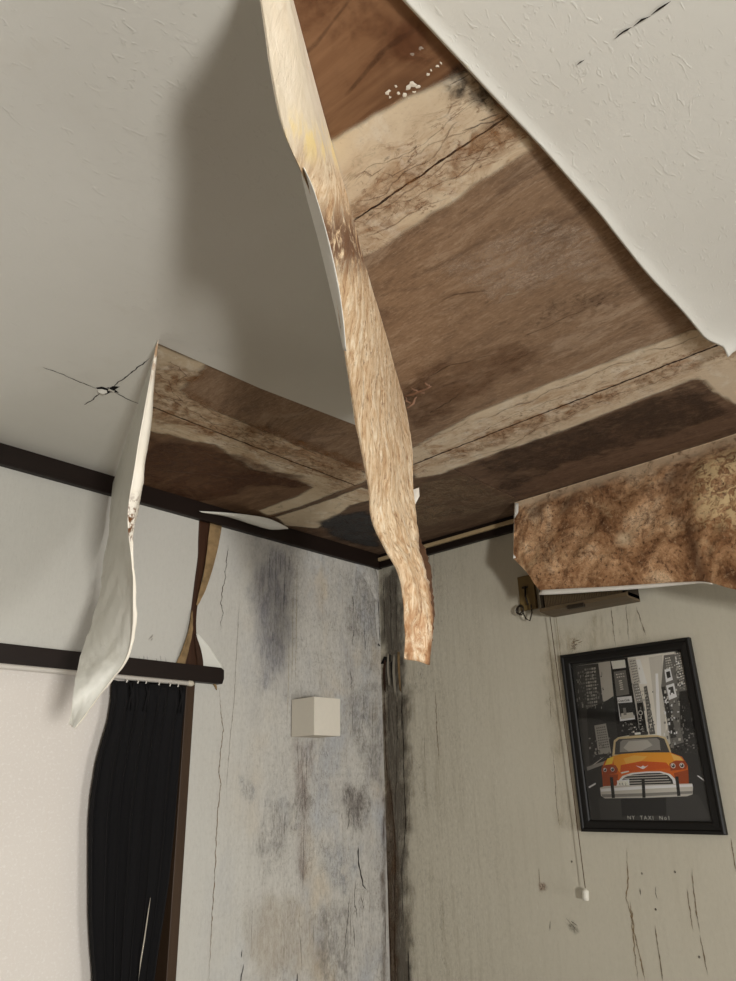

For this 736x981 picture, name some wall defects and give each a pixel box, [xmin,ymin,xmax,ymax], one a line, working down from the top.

crack [615,1,671,39]
leakage [454,70,493,104]
crack [356,115,508,219]
crack [45,361,357,486]
leakage [415,386,722,525]
crack [209,692,224,962]
leakage [381,568,410,981]
leakage [626,866,644,975]